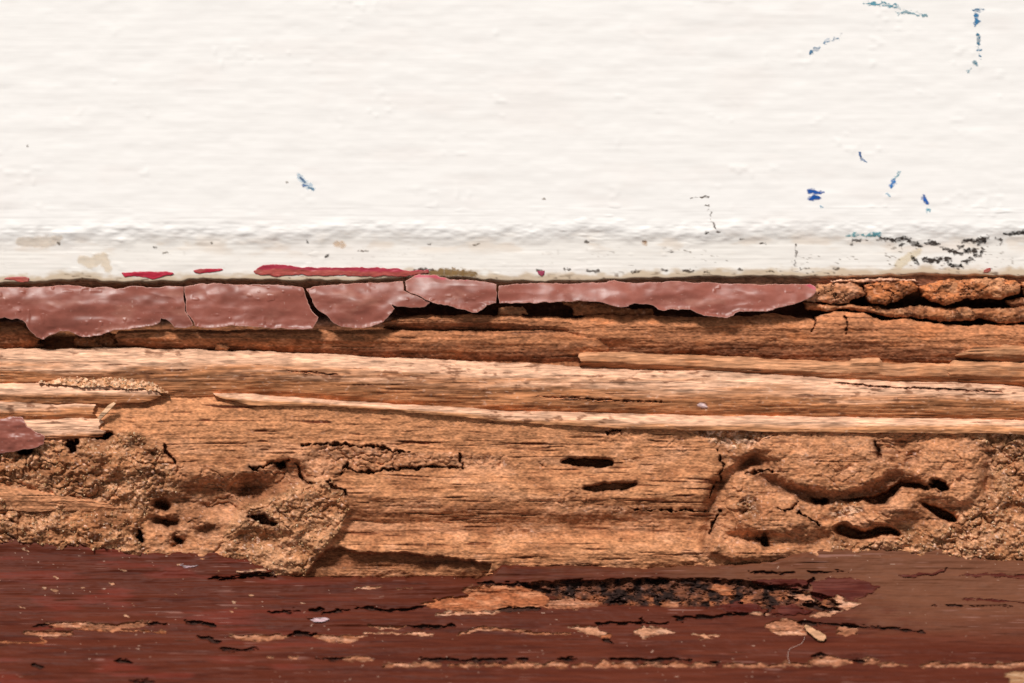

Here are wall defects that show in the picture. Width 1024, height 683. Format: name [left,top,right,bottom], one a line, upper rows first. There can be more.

peeling [0,274,816,340]
crack [249,442,464,497]
crack [777,501,821,527]
spalling [185,547,926,659]
peeling [0,621,167,644]